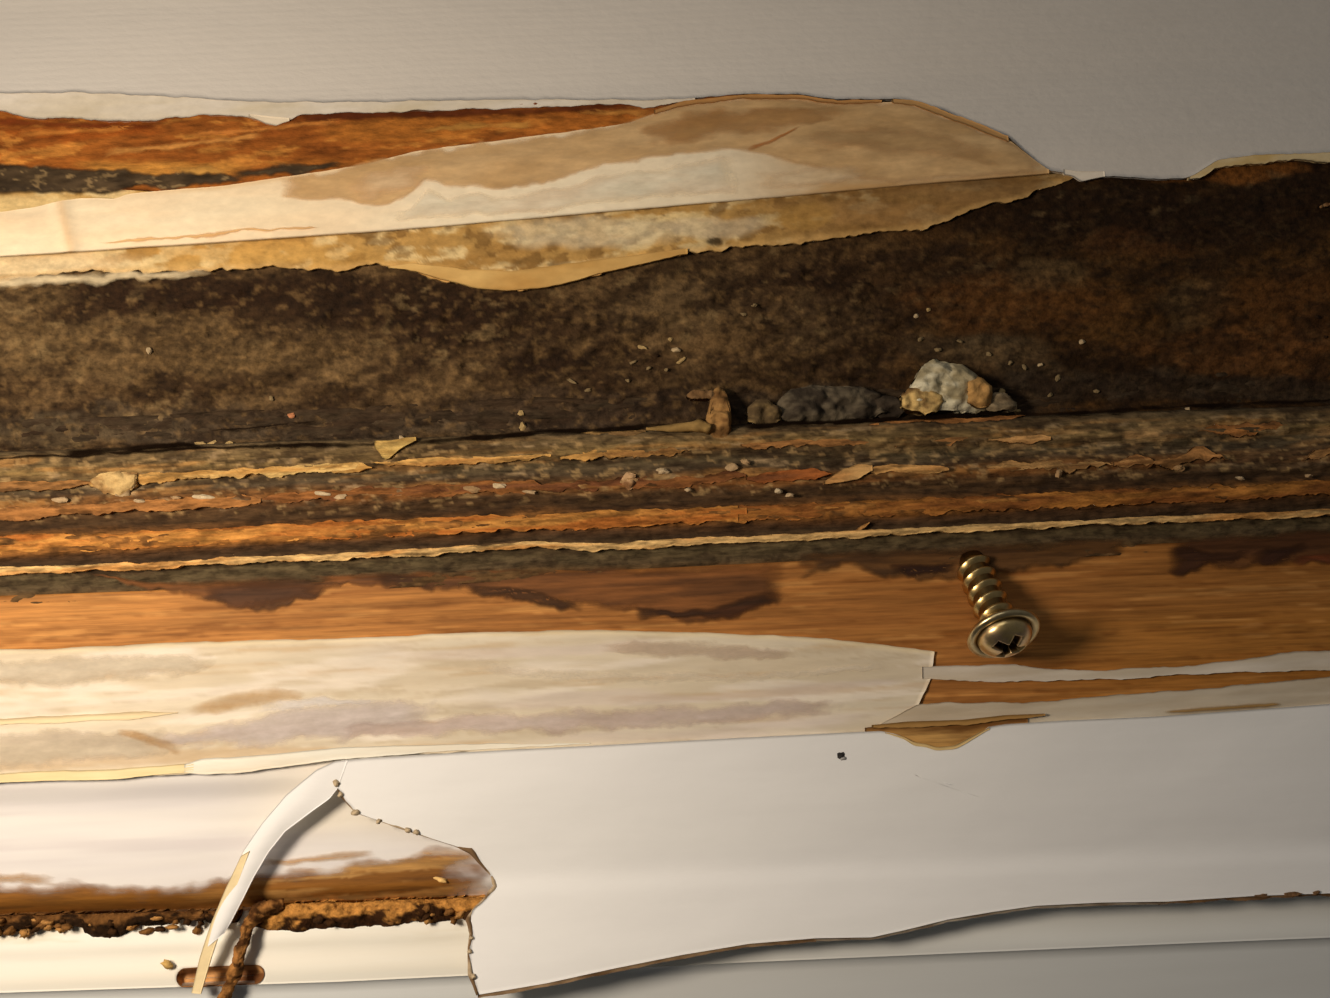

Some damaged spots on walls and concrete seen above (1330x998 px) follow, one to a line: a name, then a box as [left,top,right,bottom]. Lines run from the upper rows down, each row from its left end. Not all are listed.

corrosion [0,102,673,192]
water stain [0,163,335,194]
flaking render [0,94,1330,451]
water stain [805,541,1121,581]
water stain [1171,532,1330,576]
water stain [104,565,778,622]
peeling [0,630,1330,998]
water stain [0,877,229,914]
water stain [240,852,478,907]